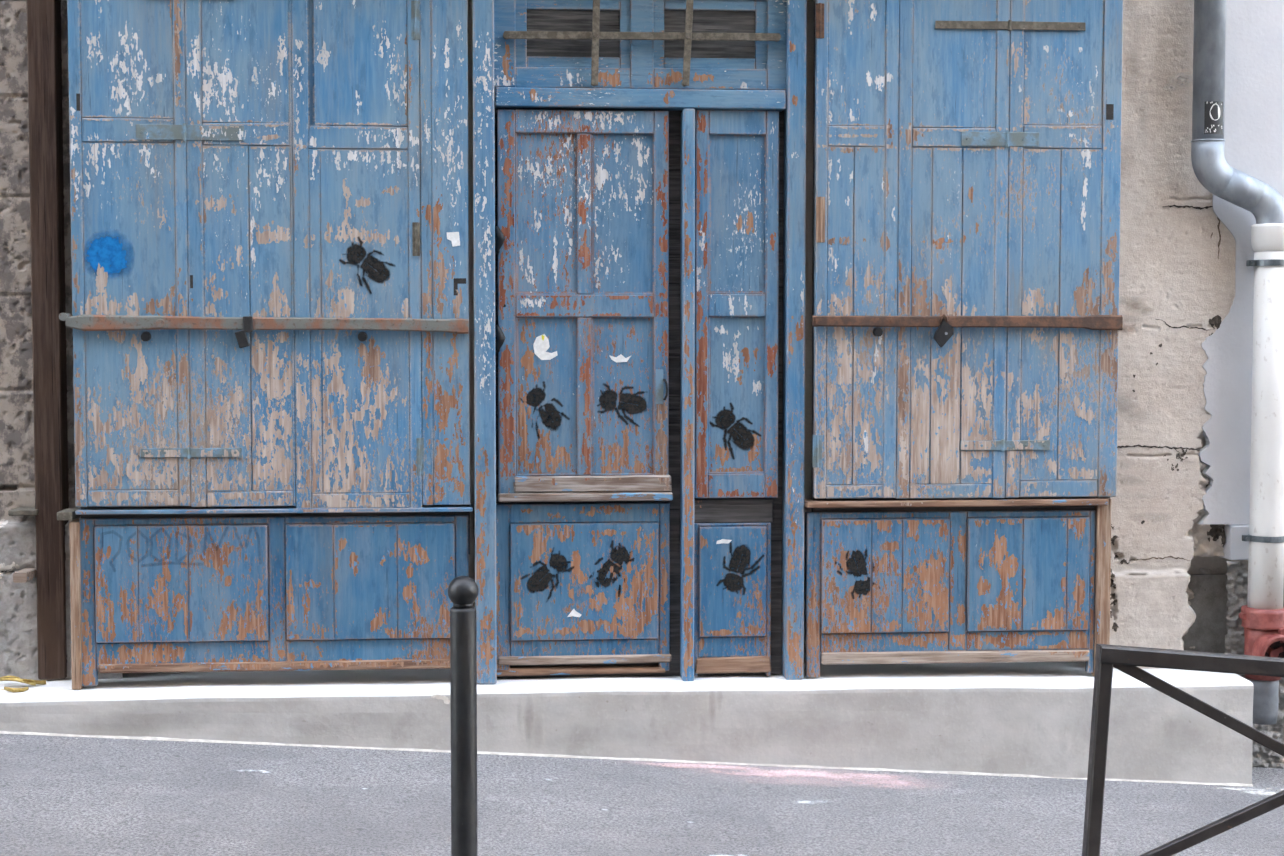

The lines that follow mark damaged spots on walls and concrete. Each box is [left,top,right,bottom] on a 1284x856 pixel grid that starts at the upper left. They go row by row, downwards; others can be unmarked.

crack [1156,319,1207,331]
spalling [1209,315,1222,336]
peeling [70,0,1136,686]
crack [1117,444,1199,454]
spalling [1207,524,1226,548]
crack [1130,554,1190,562]